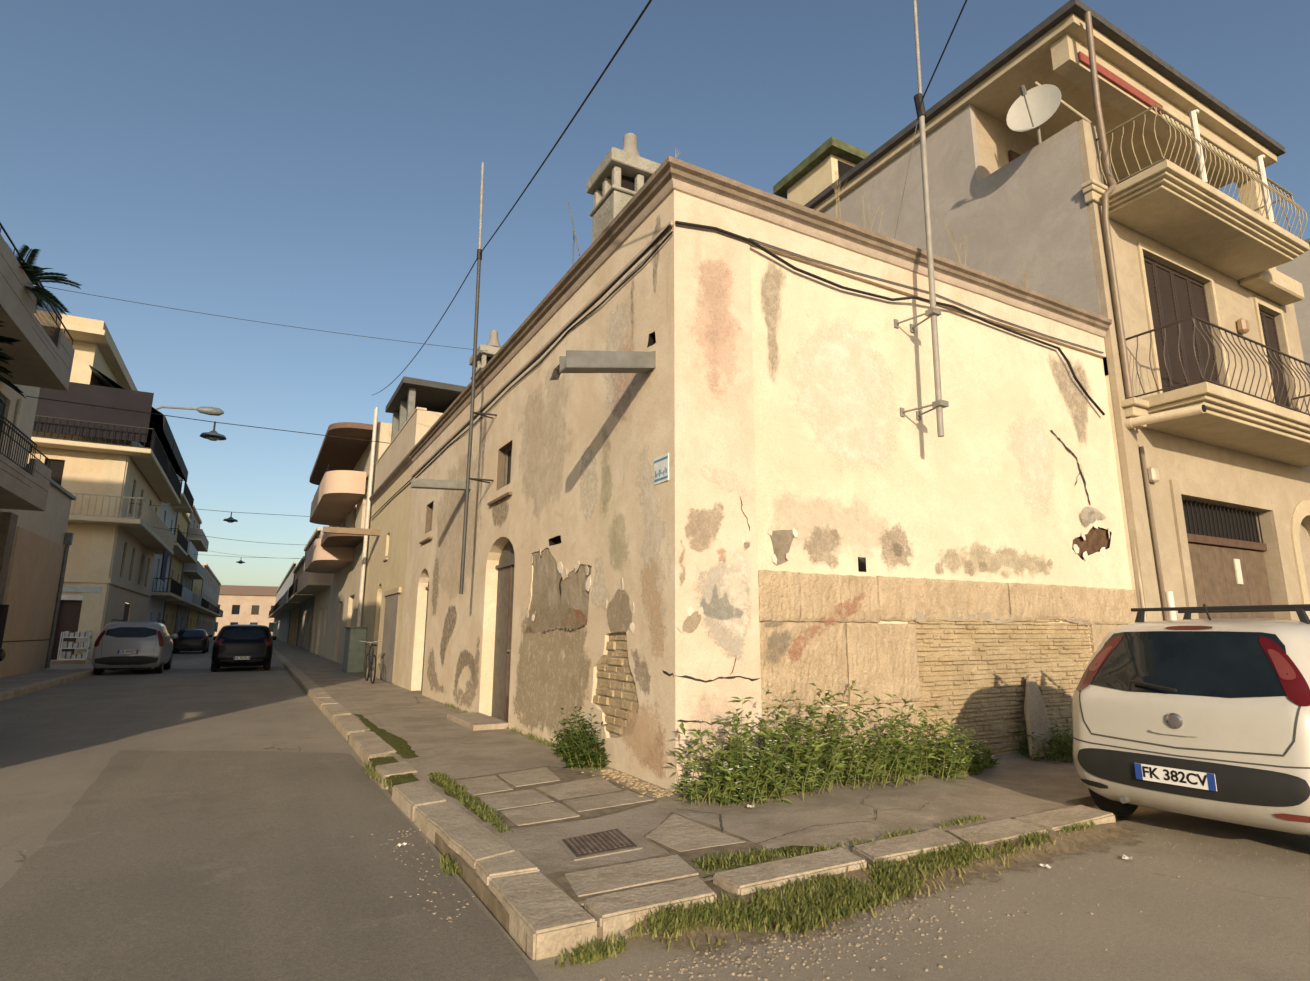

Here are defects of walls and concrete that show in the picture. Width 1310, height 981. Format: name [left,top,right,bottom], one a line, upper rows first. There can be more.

peeling [580,447,597,518]
peeling [679,504,723,583]
peeling [768,525,798,566]
spalling [1072,519,1110,561]
peeling [719,537,750,638]
spalling [526,538,704,738]
crack [662,655,760,683]